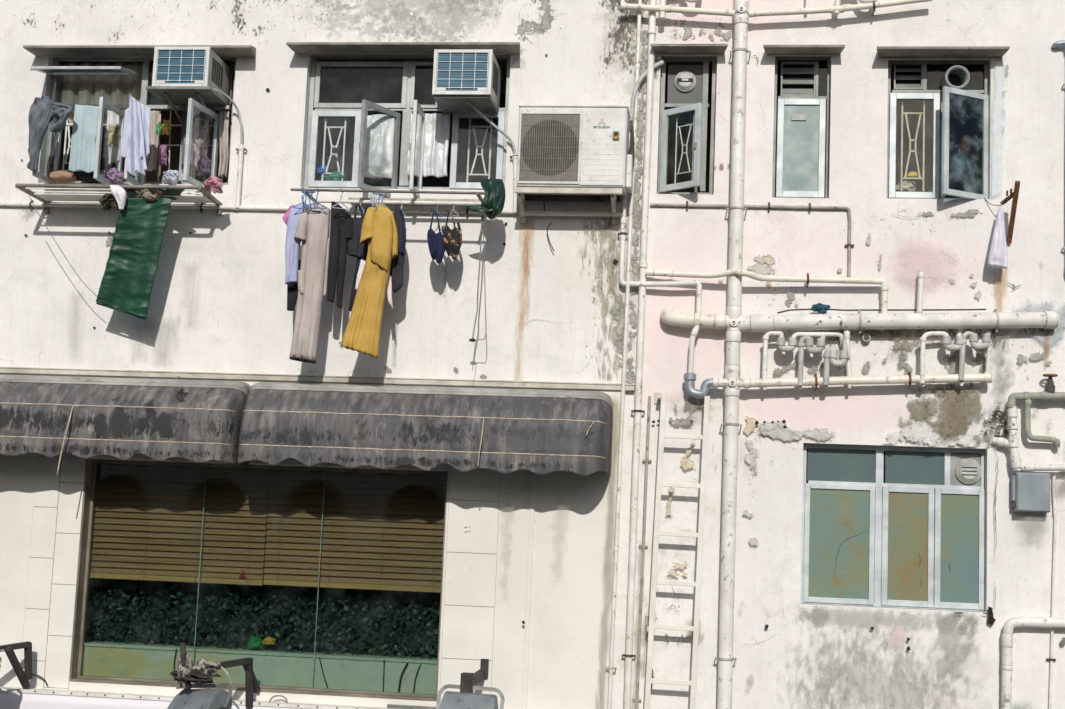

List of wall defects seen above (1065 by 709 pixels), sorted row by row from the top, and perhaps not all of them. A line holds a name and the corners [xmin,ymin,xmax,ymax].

peeling [516,0,554,44]
damp [599,0,649,74]
damp [582,218,620,378]
spalling [657,417,693,426]
peeling [680,440,697,480]
spalling [743,416,835,478]
peeling [666,487,674,517]